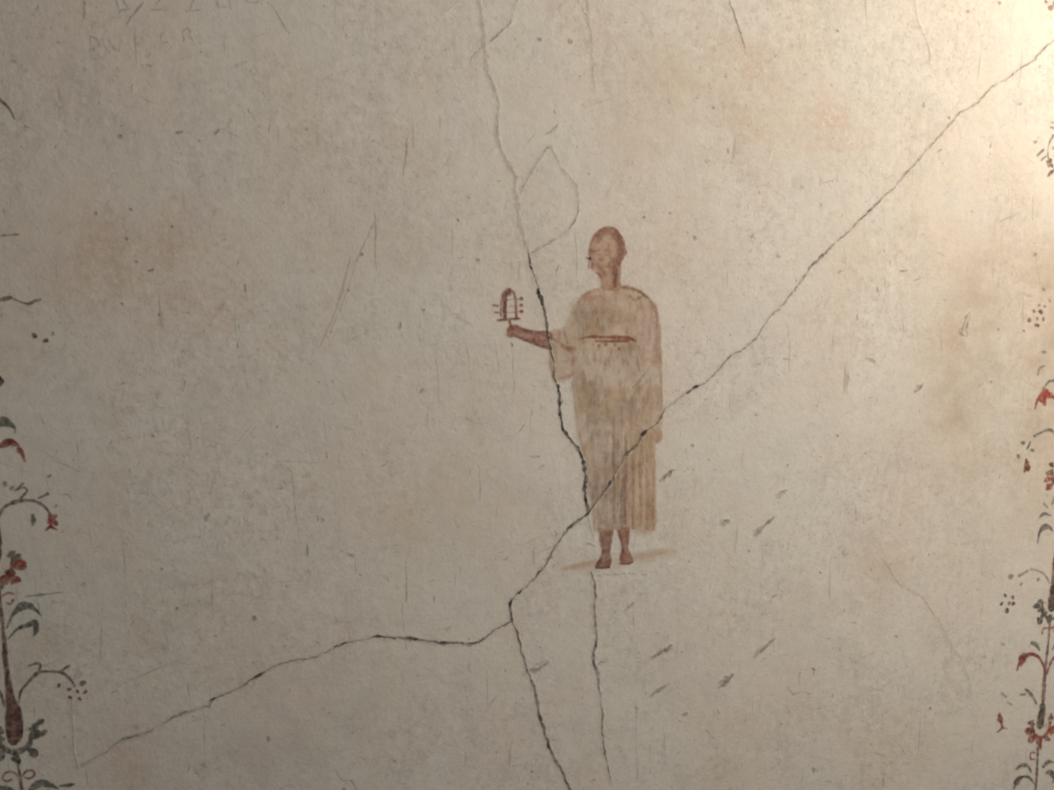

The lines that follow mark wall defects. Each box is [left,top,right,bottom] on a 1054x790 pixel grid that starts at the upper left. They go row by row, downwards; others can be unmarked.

crack [467,0,1054,619]
crack [66,616,573,790]
crack [587,570,615,787]